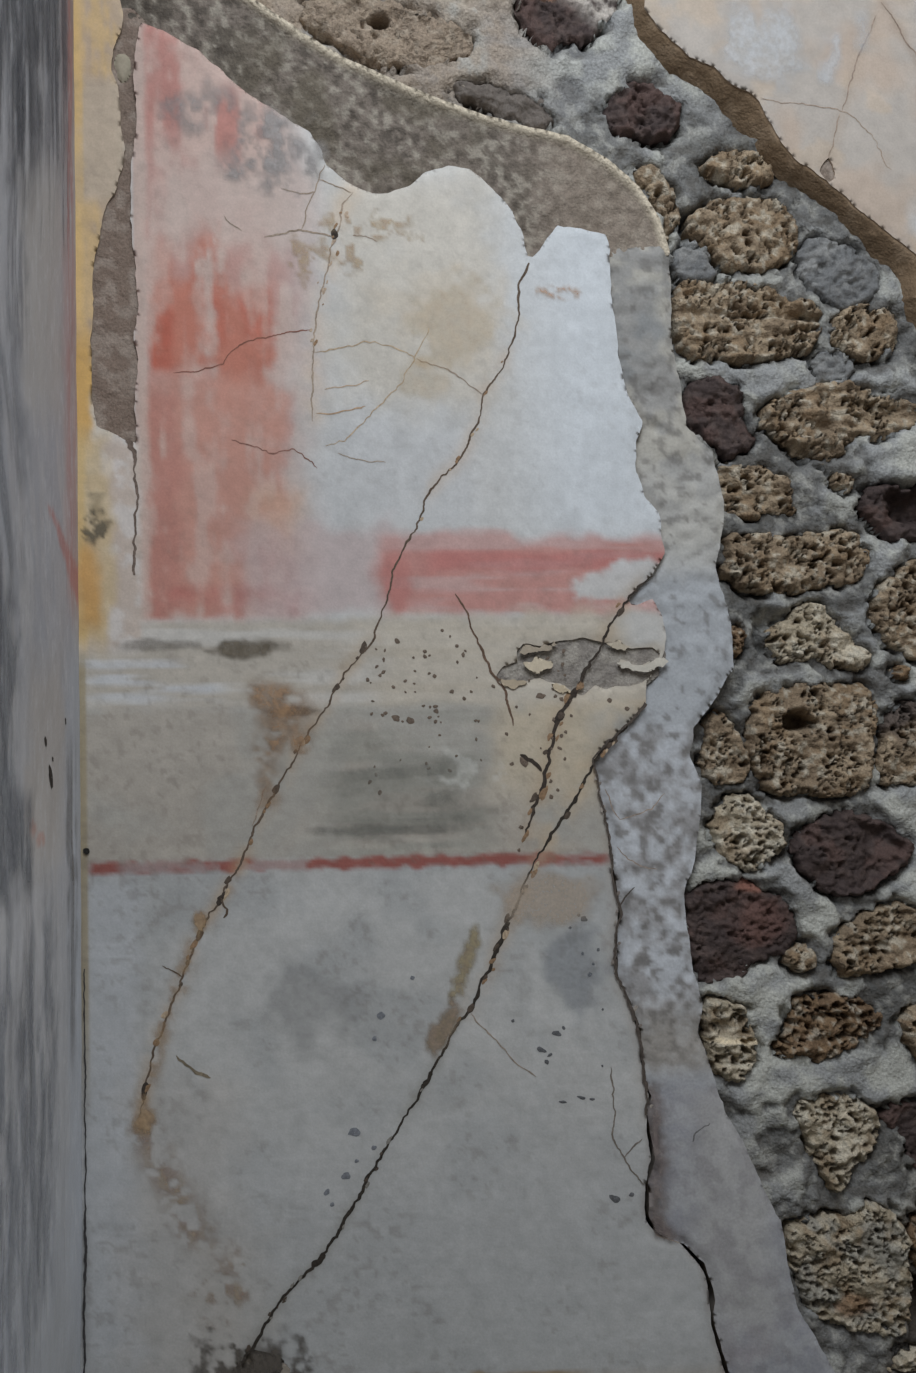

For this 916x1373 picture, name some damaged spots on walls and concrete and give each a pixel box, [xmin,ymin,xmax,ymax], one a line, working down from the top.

flaking render [91,8,147,442]
crack [763,2,916,170]
damp [195,1328,312,1373]
crack [140,165,530,1114]
crack [236,576,665,1373]
spalling [257,0,916,1373]